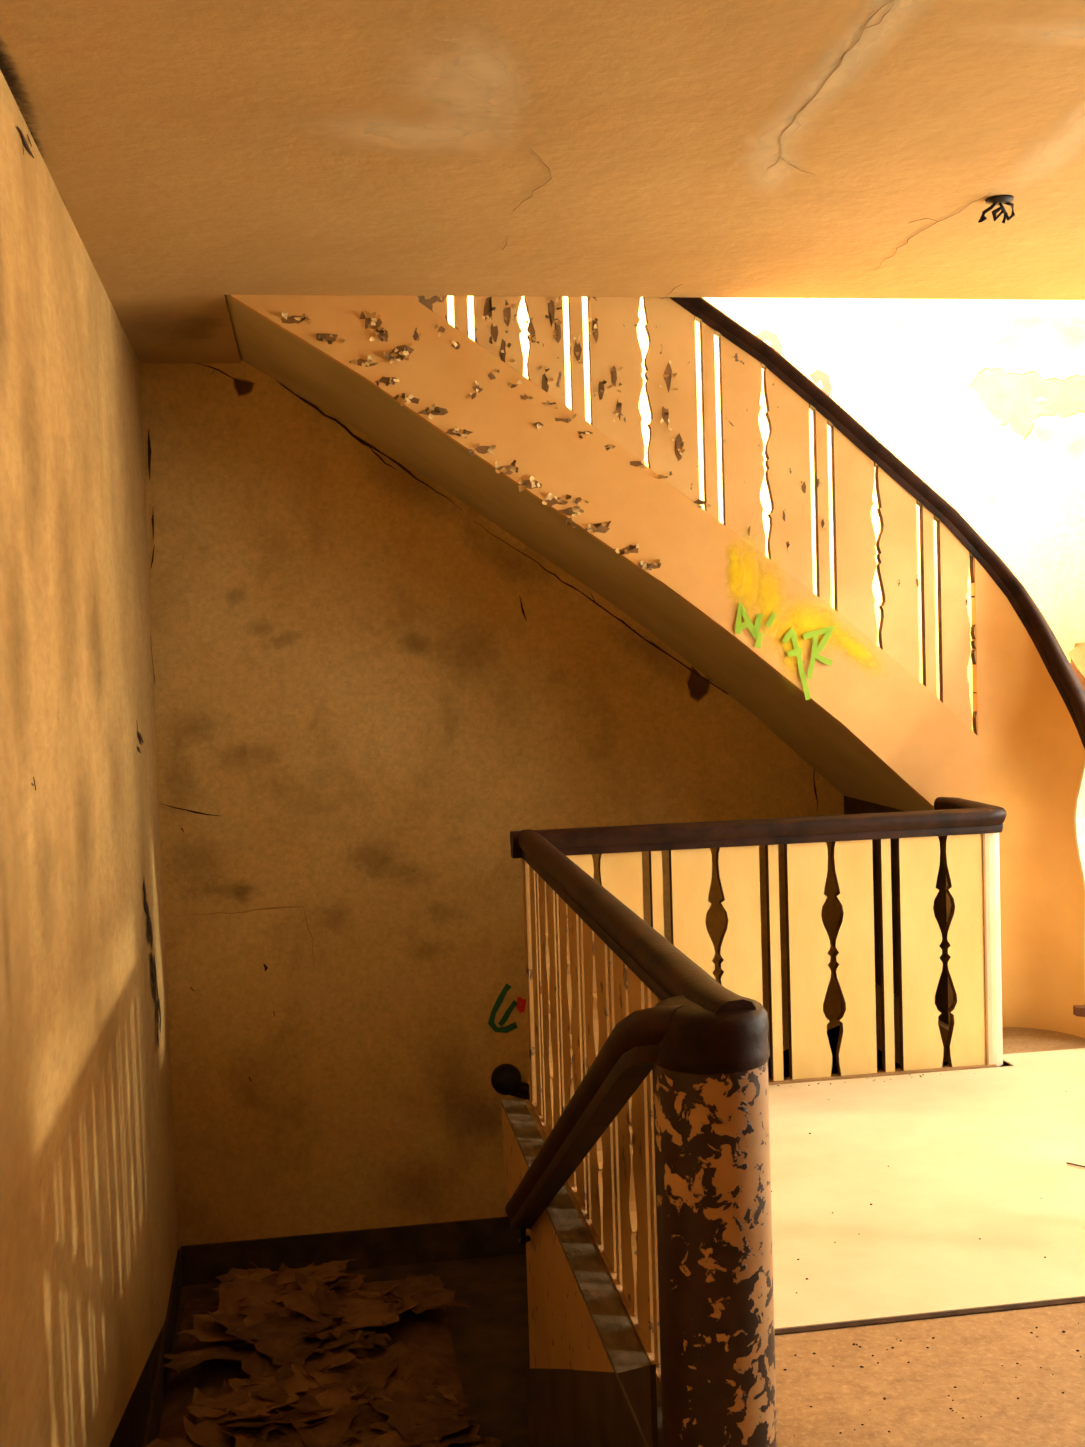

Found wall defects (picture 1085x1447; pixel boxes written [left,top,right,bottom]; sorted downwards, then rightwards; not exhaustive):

crack [766,0,894,177]
crack [875,192,991,270]
peeling [281,312,345,344]
peeling [349,297,611,534]
peeling [594,366,623,421]
peeling [630,361,685,479]
flaking render [966,366,1085,439]
peeling [613,543,661,570]